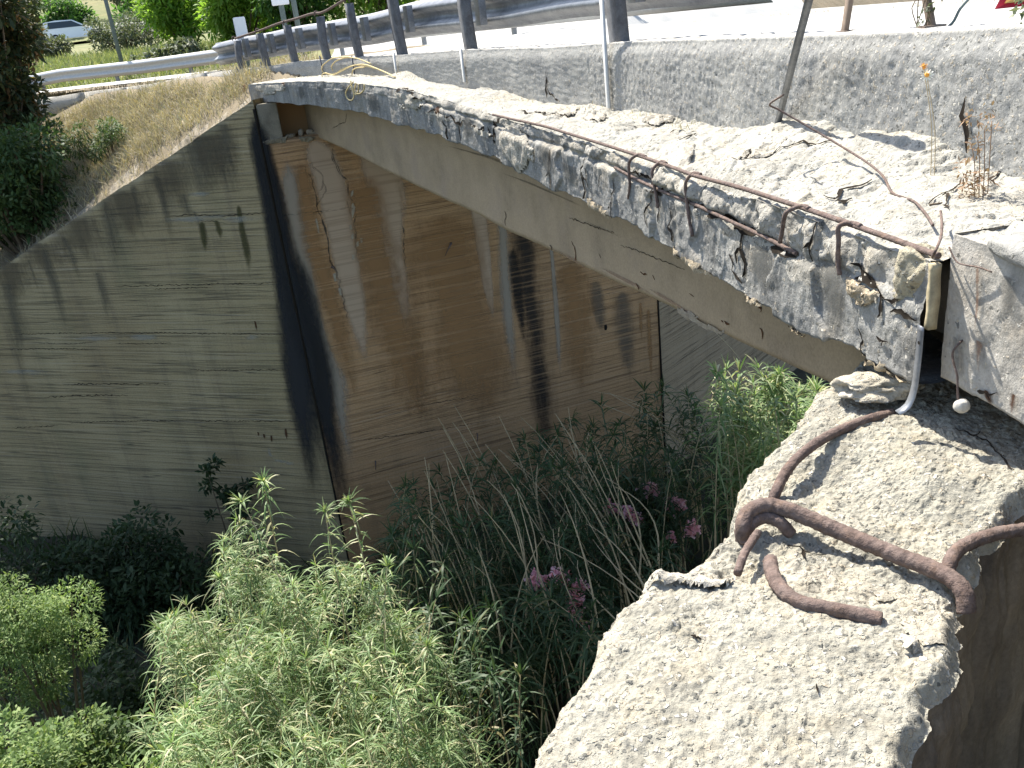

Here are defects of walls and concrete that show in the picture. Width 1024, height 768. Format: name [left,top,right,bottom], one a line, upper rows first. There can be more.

crack [179,122,357,316]
water stain [249,122,347,488]
water stain [307,141,366,352]
water stain [472,211,549,430]
spalling [555,105,607,122]
spalling [471,113,942,307]
crack [732,140,829,160]
crack [824,179,872,204]
spalling [861,352,907,383]
spalling [645,408,1024,654]